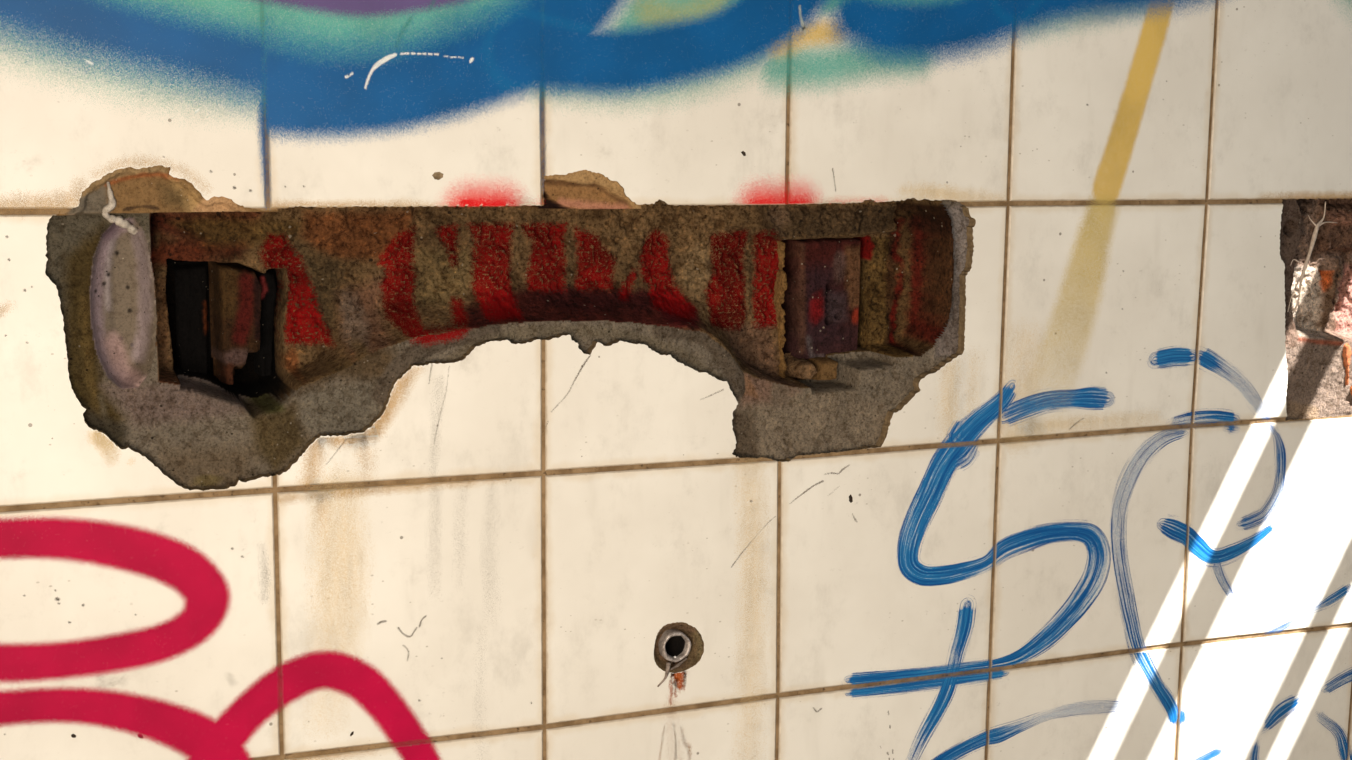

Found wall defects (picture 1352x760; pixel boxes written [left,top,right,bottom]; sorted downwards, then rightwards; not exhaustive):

spalling [45,156,969,488]
spalling [1280,198,1352,421]
rust [659,671,692,760]